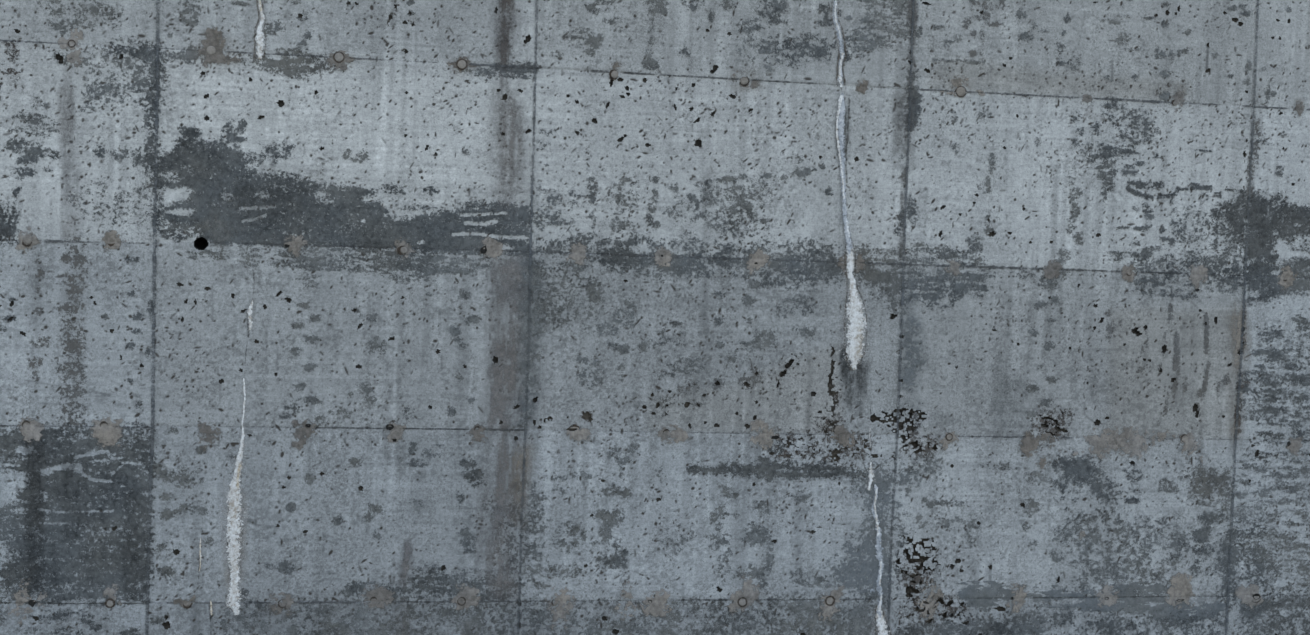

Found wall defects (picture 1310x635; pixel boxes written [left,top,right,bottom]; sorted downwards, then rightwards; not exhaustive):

leakage [25,439,43,542]
crack [197,249,255,622]
leakage [37,0,492,427]
peeling [214,408,1310,635]
peeling [686,346,943,482]
crack [830,0,897,635]